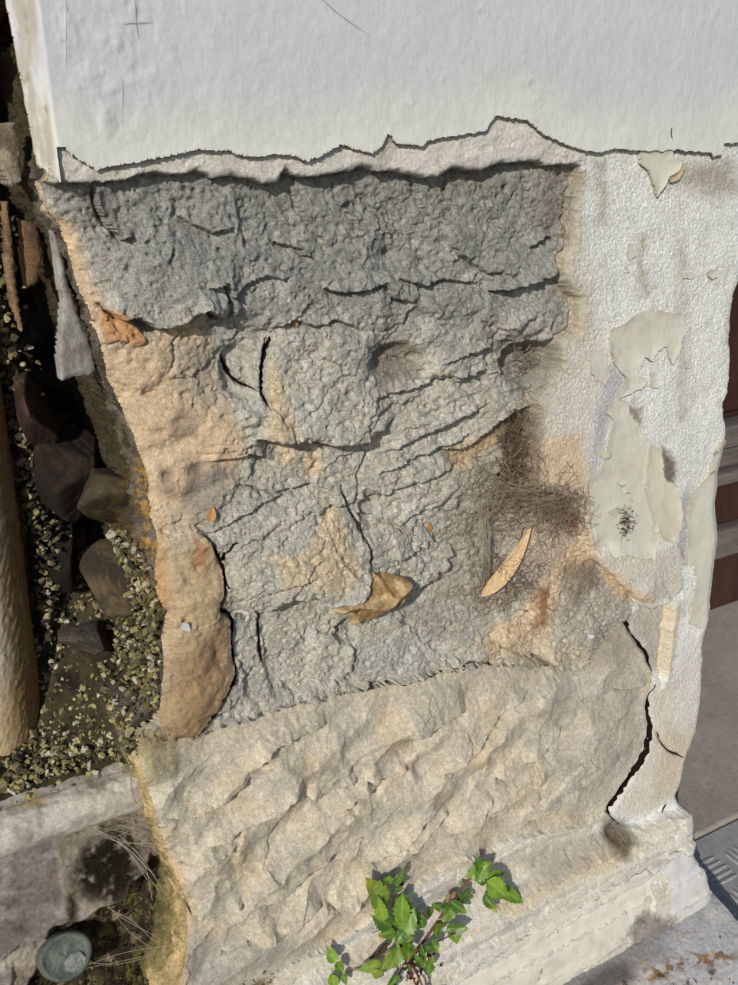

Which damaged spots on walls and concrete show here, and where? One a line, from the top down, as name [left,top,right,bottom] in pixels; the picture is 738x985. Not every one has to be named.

peeling [639,150,686,197]
crack [220,336,272,411]
spalling [41,161,726,742]
crack [199,529,263,732]
crack [606,620,684,822]